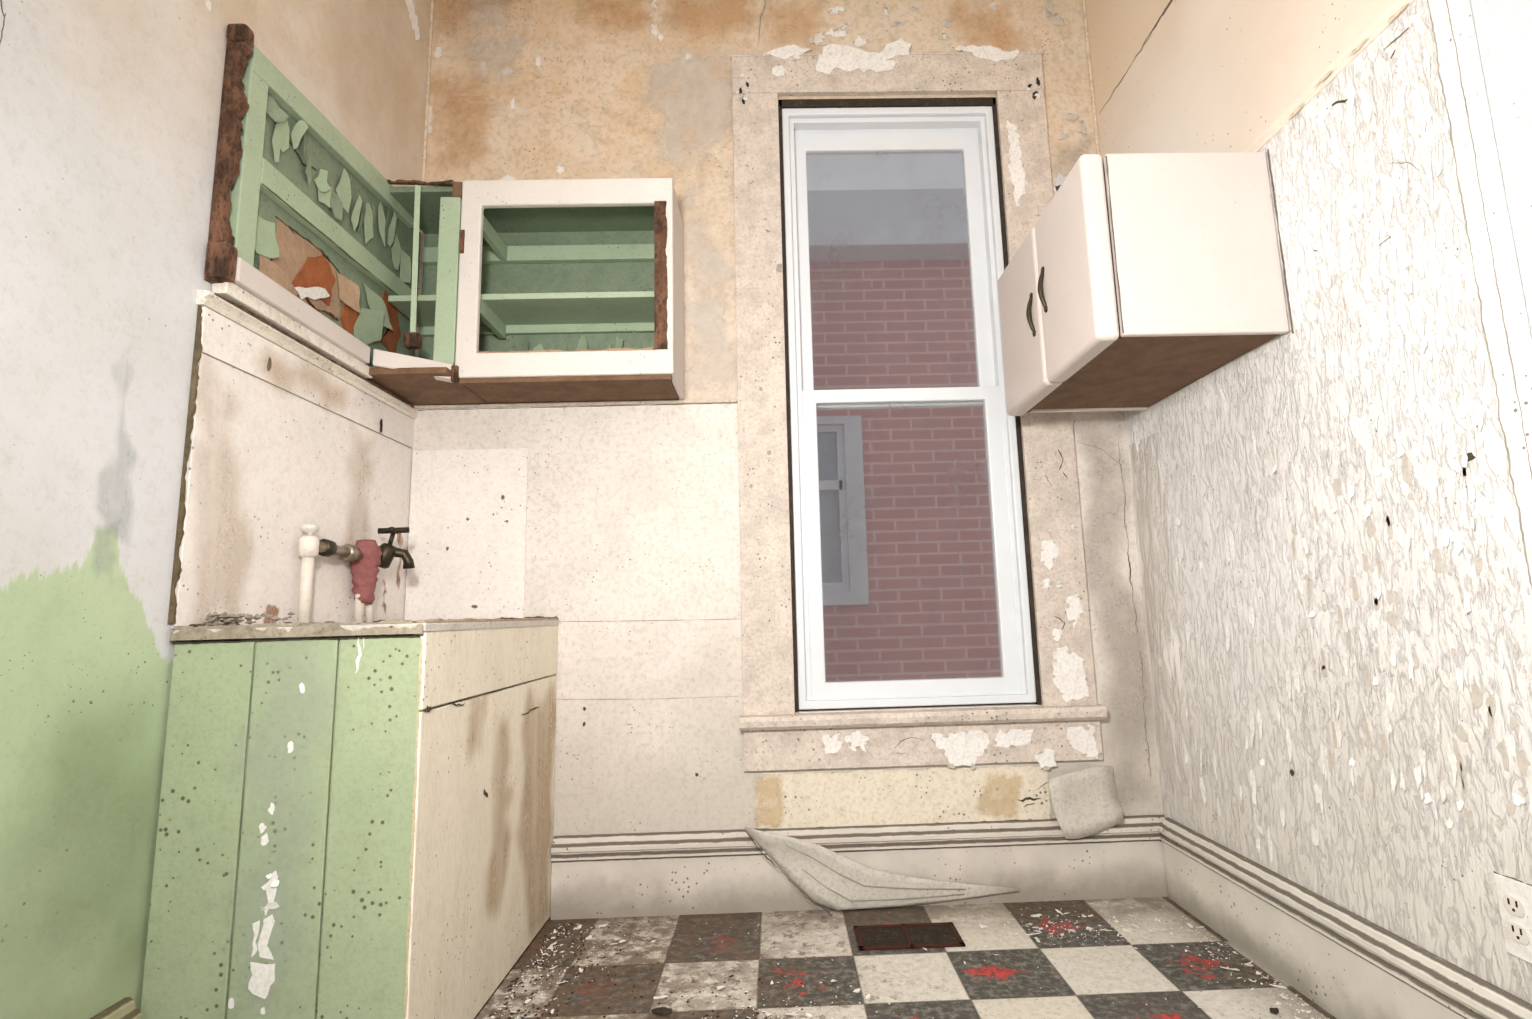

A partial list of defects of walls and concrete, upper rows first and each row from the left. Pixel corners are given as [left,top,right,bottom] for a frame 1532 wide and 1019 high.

crack [0,0,8,43]
peeling [763,4,918,77]
peeling [938,18,1020,63]
crack [1100,0,1173,112]
peeling [271,218,358,334]
peeling [381,291,401,353]
peeling [1039,523,1093,702]
peeling [1232,401,1496,863]
peeling [925,724,1102,807]
peeling [1451,648,1532,815]
peeling [259,803,275,846]
peeling [248,870,280,1015]